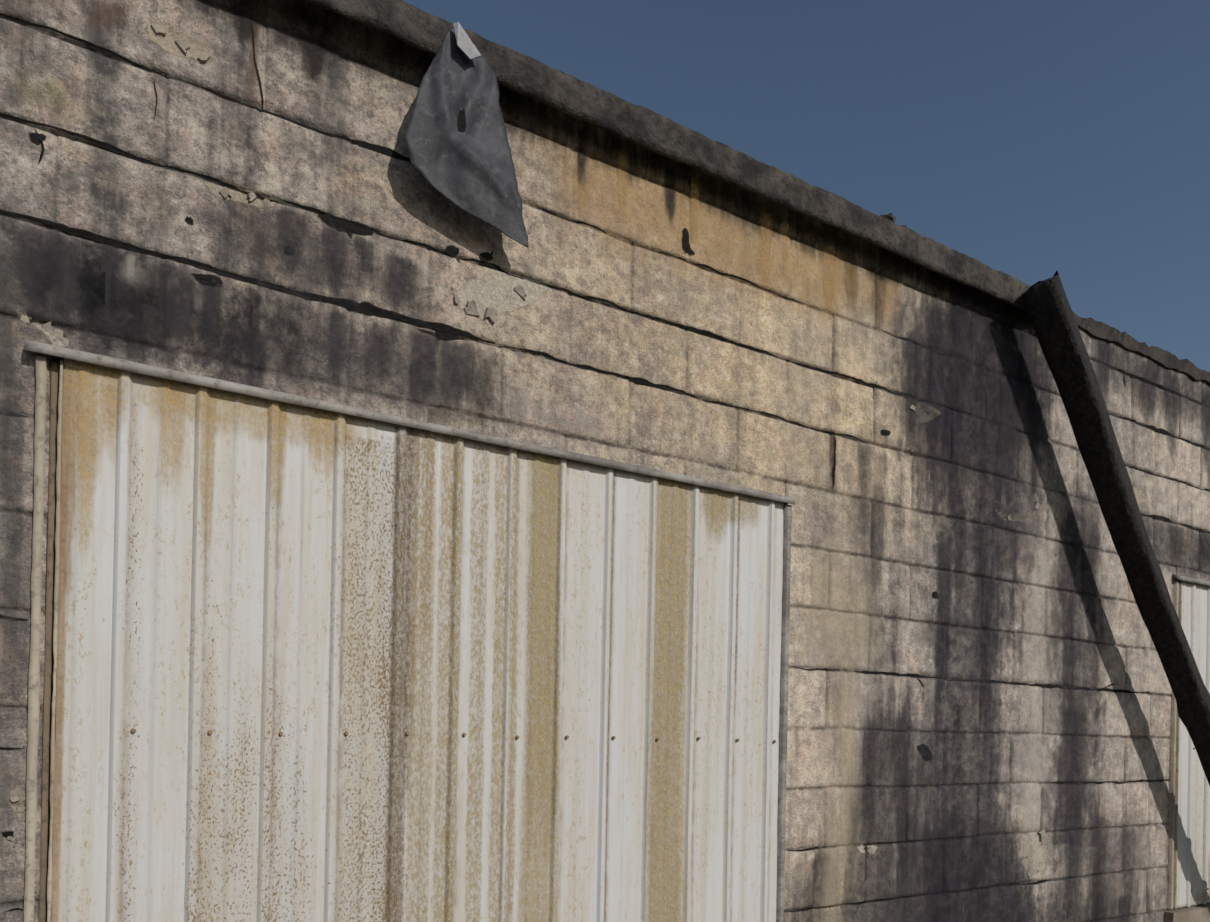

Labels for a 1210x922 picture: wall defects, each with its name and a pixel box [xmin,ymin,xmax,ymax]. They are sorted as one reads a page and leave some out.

crack [0,13,410,161]
damp [196,0,431,87]
rust [53,650,63,868]
rust [58,360,136,611]
rust [112,671,140,922]
rust [123,420,143,654]
damp [5,227,484,414]
damp [252,211,371,289]
rust [154,377,560,922]
rust [646,478,756,922]
damp [499,85,1130,922]
damp [1097,339,1210,465]